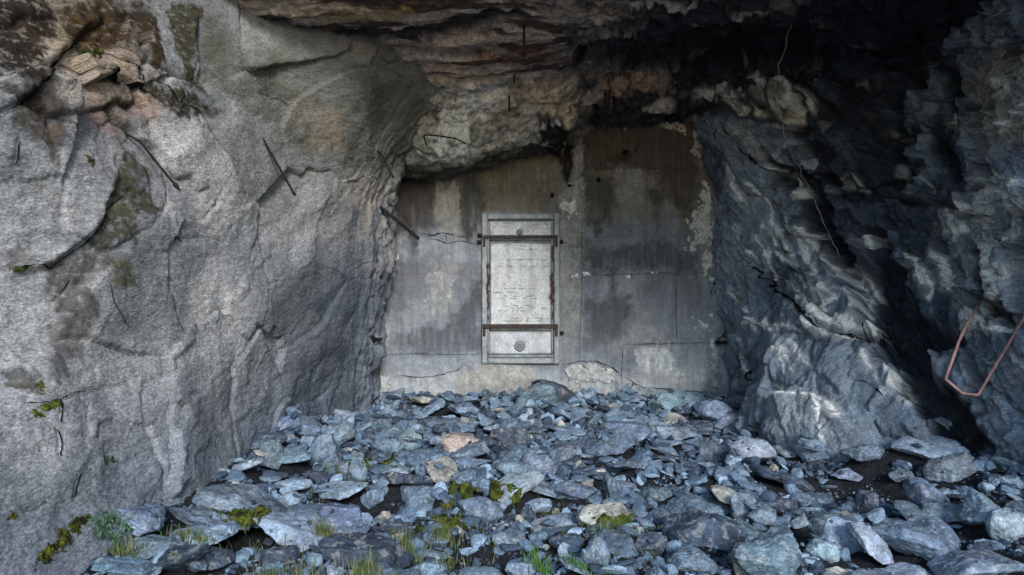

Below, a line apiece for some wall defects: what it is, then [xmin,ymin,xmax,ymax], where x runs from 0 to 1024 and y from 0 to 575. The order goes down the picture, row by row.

crack [421,232,478,244]
water stain [397,120,701,378]
peeling [683,180,715,281]
crack [389,353,464,377]
spalling [564,362,618,393]